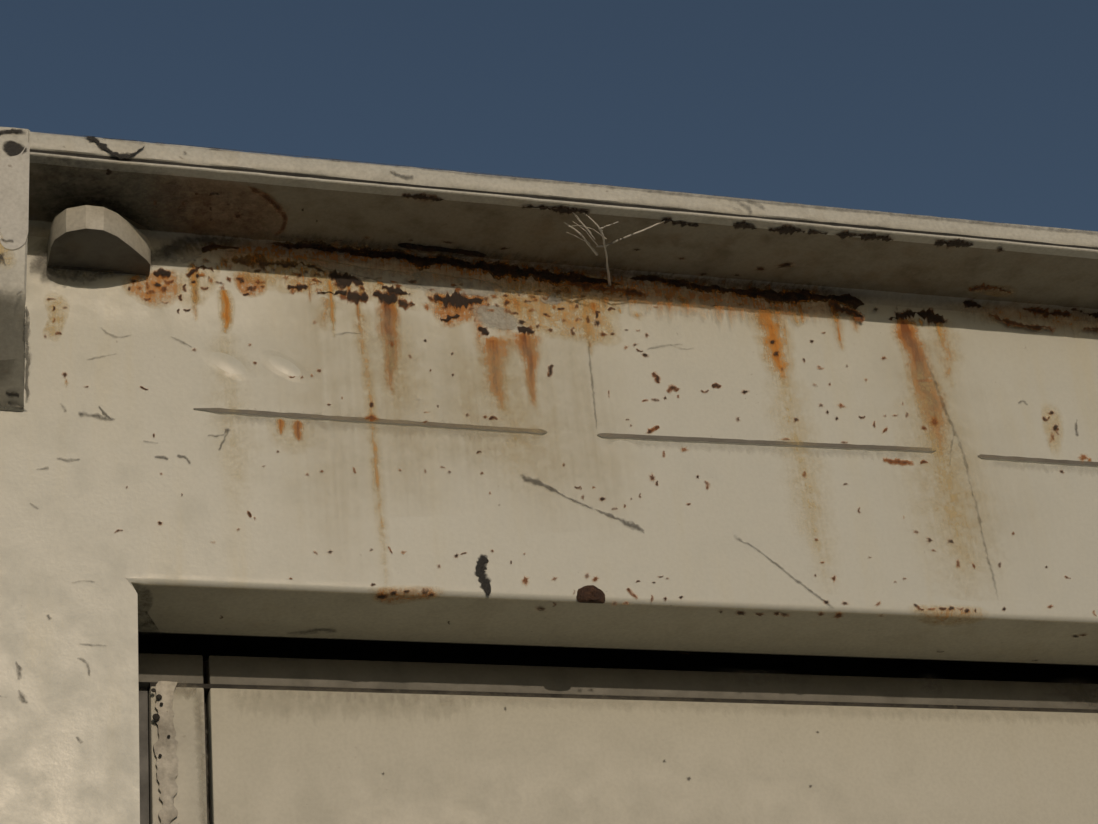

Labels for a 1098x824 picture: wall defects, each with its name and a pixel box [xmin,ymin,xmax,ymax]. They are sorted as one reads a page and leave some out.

corrosion [128,268,177,303]
corrosion [963,283,1098,332]
corrosion [173,188,878,488]
corrosion [883,308,961,518]
corrosion [371,583,434,601]